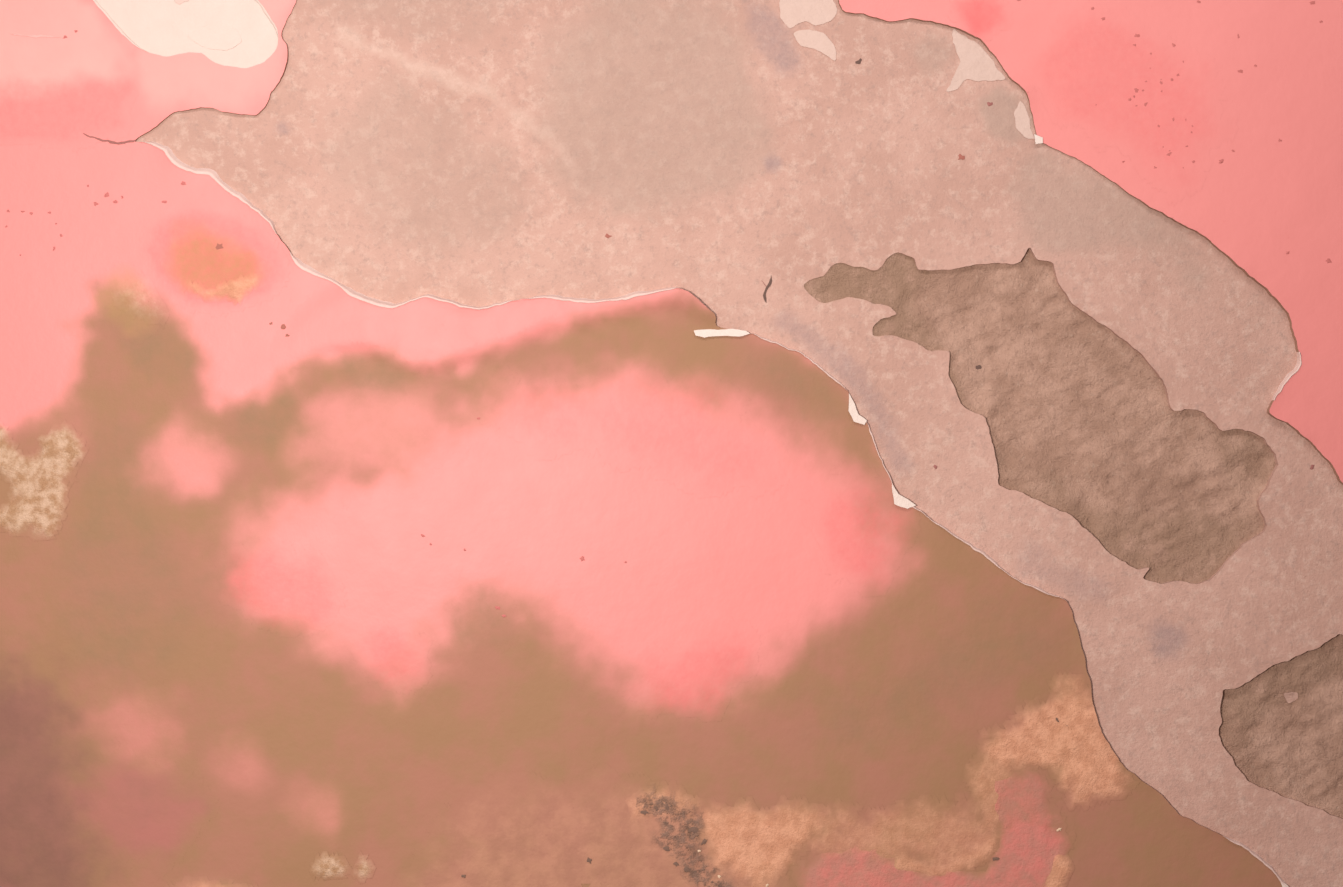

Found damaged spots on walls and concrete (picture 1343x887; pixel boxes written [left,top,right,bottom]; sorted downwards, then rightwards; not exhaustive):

peeling [93,0,279,68]
peeling [779,0,837,28]
peeling [793,29,836,61]
peeling [946,29,1005,92]
peeling [1014,101,1043,144]
peeling [145,142,278,235]
peeling [694,329,750,338]
flaking render [804,248,1278,584]
leakage [0,202,1282,887]
peeling [913,506,1063,599]
flaking render [1219,634,1343,819]
spalling [791,766,1077,887]